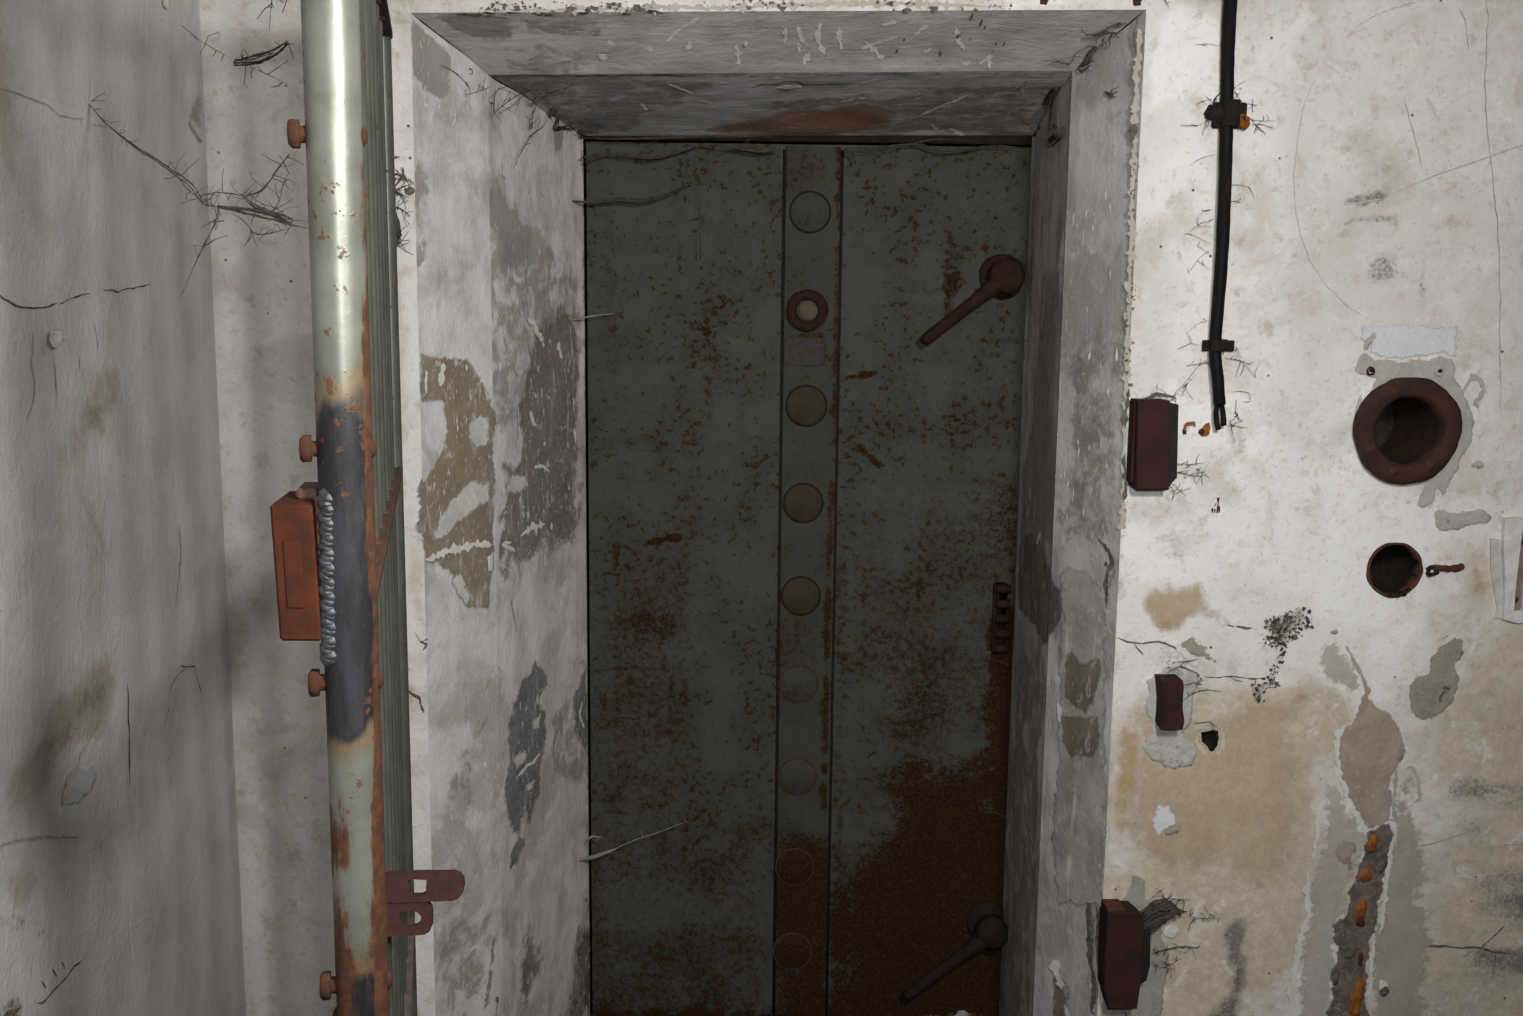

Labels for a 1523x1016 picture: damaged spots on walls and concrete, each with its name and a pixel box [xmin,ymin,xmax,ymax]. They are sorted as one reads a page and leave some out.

corrosion [709,106,890,135]
crack [0,284,149,309]
spalling [1117,15,1145,529]
peeling [418,304,583,608]
peeling [505,661,547,868]
peeling [1018,533,1180,1016]
damp [1119,607,1314,869]
spalling [1286,629,1433,1016]
corrosion [1326,824,1394,1016]
spalling [1409,638,1464,719]